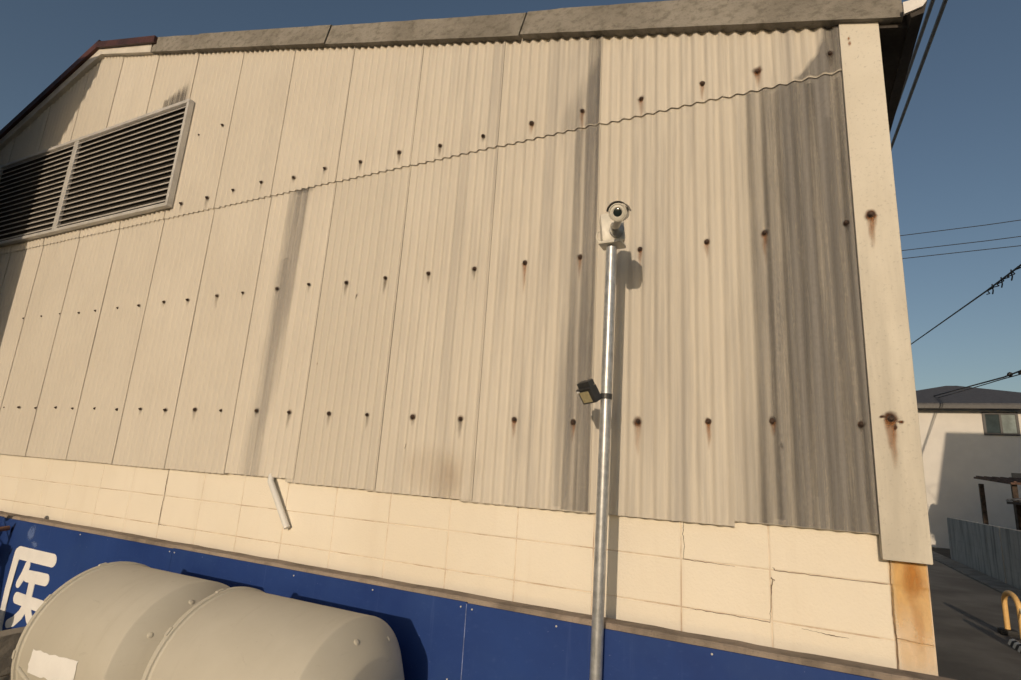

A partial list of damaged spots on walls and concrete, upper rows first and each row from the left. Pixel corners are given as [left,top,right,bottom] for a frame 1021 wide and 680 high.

damp [587,69,599,202]
damp [774,25,880,534]
rust [880,413,904,442]
crack [687,560,933,669]
rust [892,561,931,632]